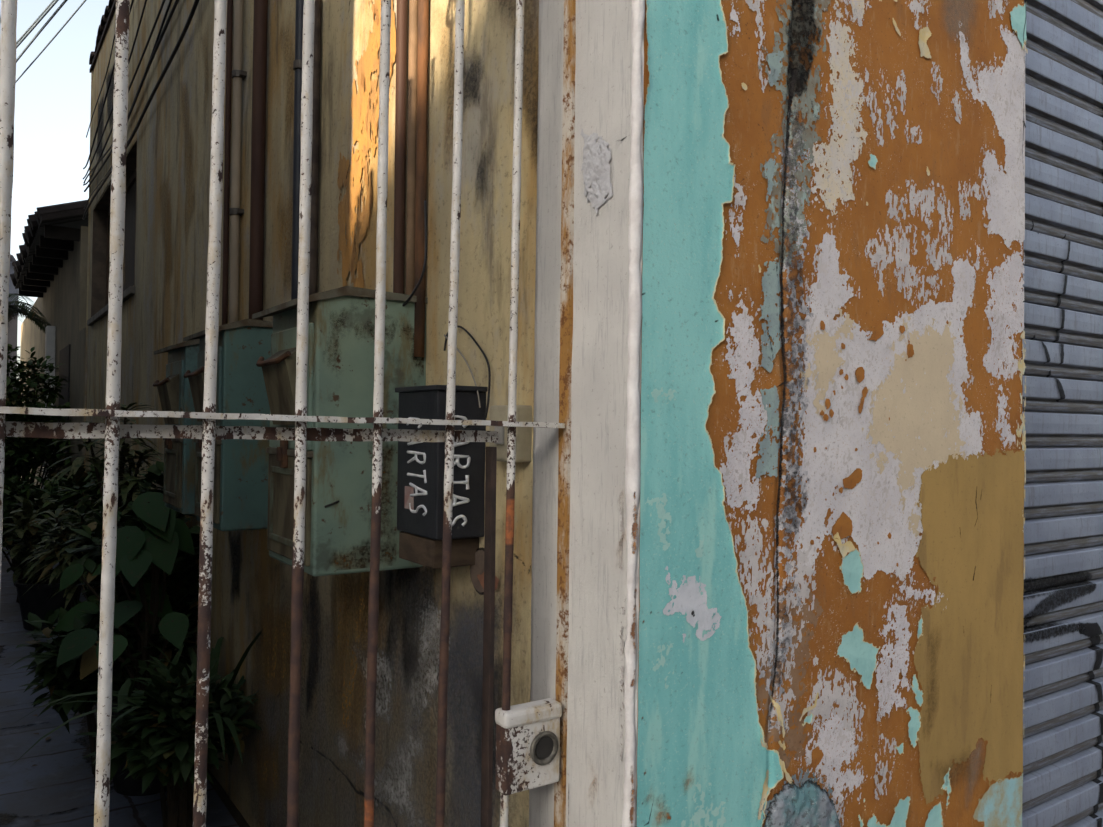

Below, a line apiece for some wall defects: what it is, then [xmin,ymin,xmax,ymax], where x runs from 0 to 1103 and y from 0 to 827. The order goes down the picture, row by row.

damp [786,0,821,96]
damp [779,112,807,545]
peeling [637,0,1028,827]
damp [228,531,240,599]
damp [250,567,509,827]